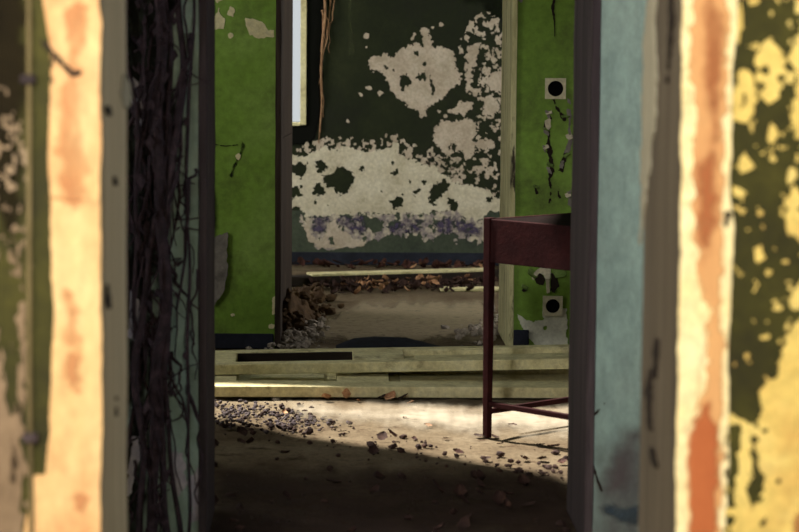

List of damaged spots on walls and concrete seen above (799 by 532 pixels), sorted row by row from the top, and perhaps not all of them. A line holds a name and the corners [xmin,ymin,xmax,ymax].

peeling [215,0,235,39]
peeling [245,18,274,39]
crack [549,0,557,37]
flaking render [292,12,502,251]
peeling [543,98,573,174]
flaking render [0,0,103,532]
peeling [521,268,567,293]
flaking render [675,0,799,532]
flaking render [517,308,568,345]